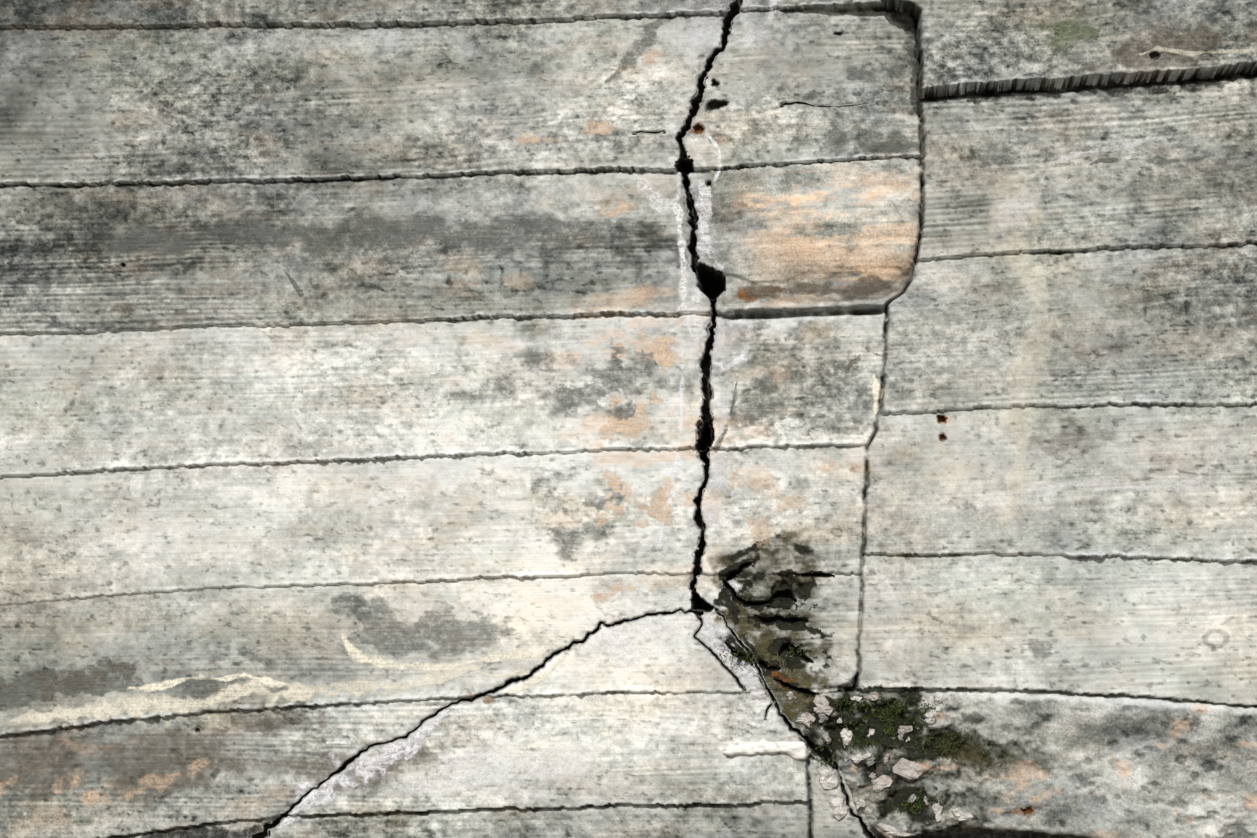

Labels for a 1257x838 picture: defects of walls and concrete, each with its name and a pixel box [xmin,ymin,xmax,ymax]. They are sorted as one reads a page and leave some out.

crack [250,0,877,838]
damp [695,616,776,728]
damp [799,688,1078,838]